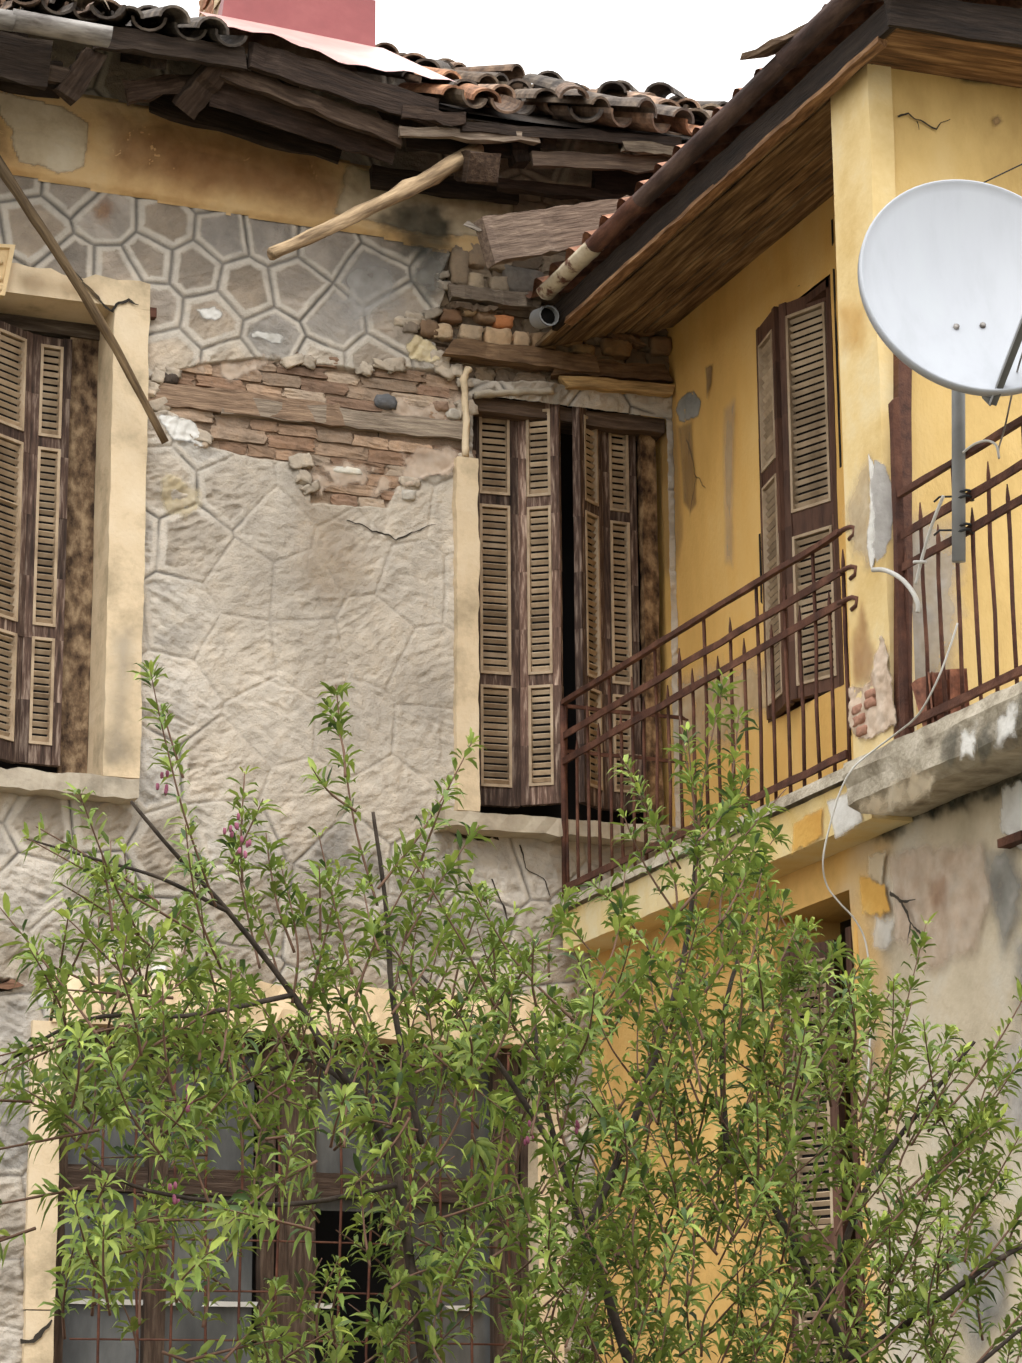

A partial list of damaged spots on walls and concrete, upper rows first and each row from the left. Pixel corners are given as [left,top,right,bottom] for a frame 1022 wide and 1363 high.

peeling [0,92,88,173]
crack [76,273,138,312]
flaking render [148,166,674,508]
flaking render [676,392,701,422]
flaking render [867,455,893,568]
flaking render [848,636,896,739]